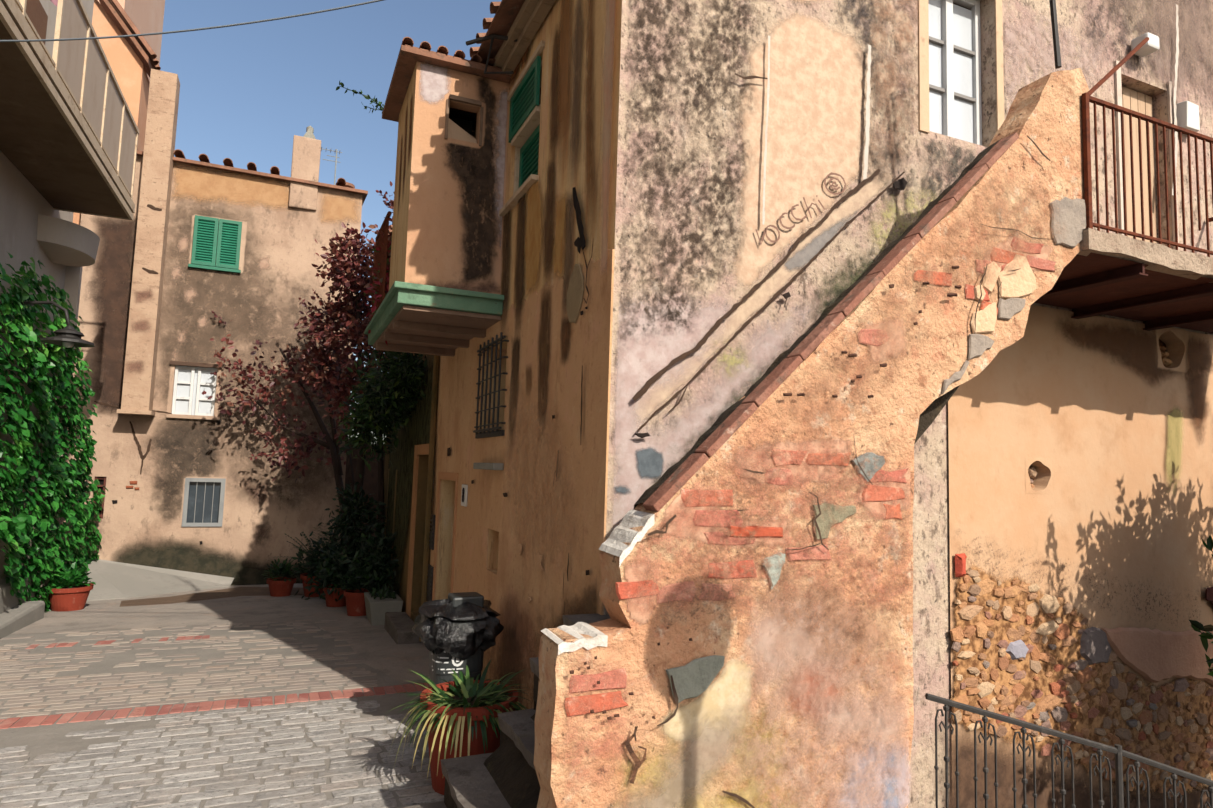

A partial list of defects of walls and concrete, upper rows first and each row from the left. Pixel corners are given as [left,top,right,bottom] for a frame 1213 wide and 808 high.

leakage [843,0,919,179]
leakage [95,207,335,512]
leakage [432,77,526,320]
leakage [509,0,594,444]
leakage [613,0,792,526]
flaking render [841,310,922,367]
flaking render [914,235,1056,394]
leakage [115,542,310,586]
flaking render [615,439,852,623]
flaking render [857,468,911,520]
spalling [1205,587,1213,605]
flaking render [564,656,634,720]